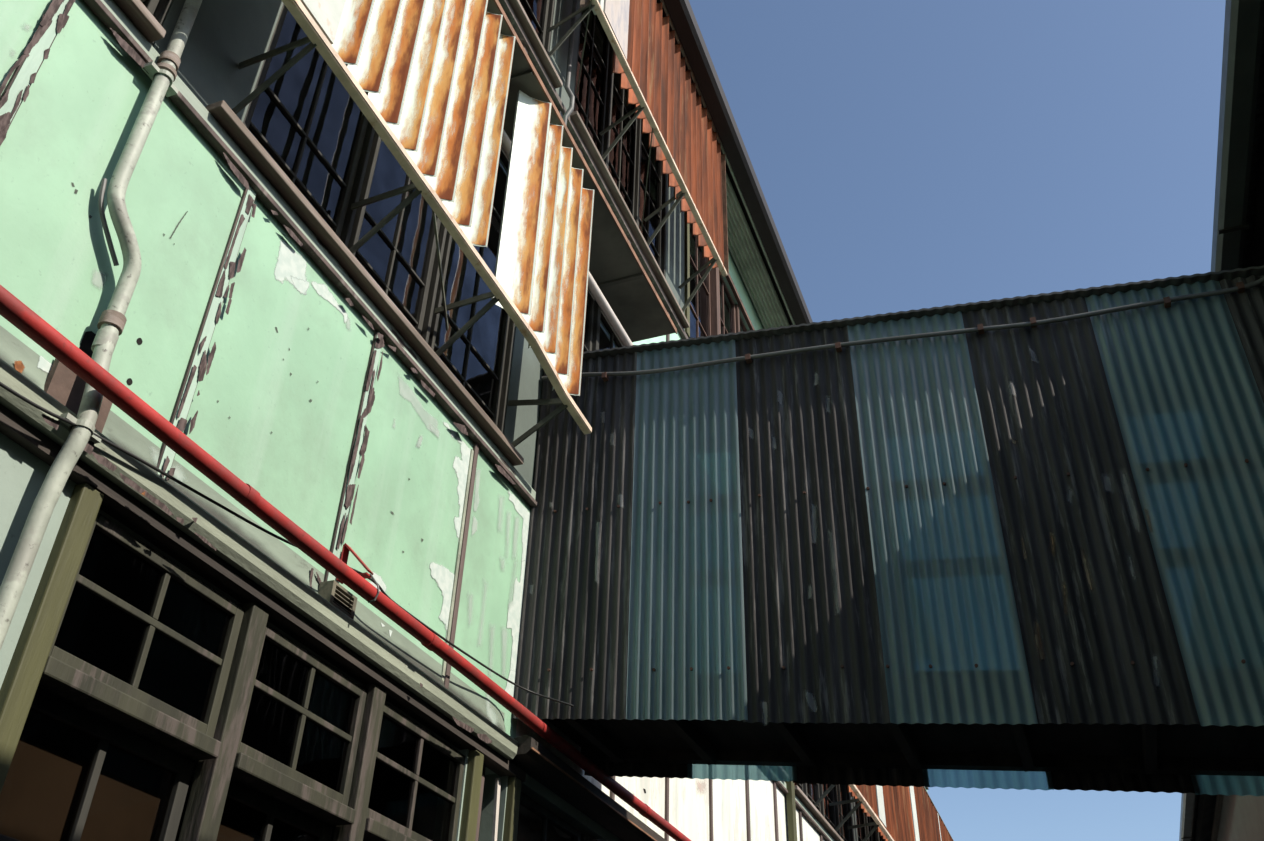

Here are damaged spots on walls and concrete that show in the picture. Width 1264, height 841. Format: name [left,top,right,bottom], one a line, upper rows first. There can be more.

peeling [0,0,75,146]
corrosion [338,0,516,246]
peeling [216,152,257,324]
corrosion [514,99,594,394]
peeling [177,336,216,434]
peeling [271,210,396,549]
peeling [399,367,480,538]
peeling [430,562,454,642]